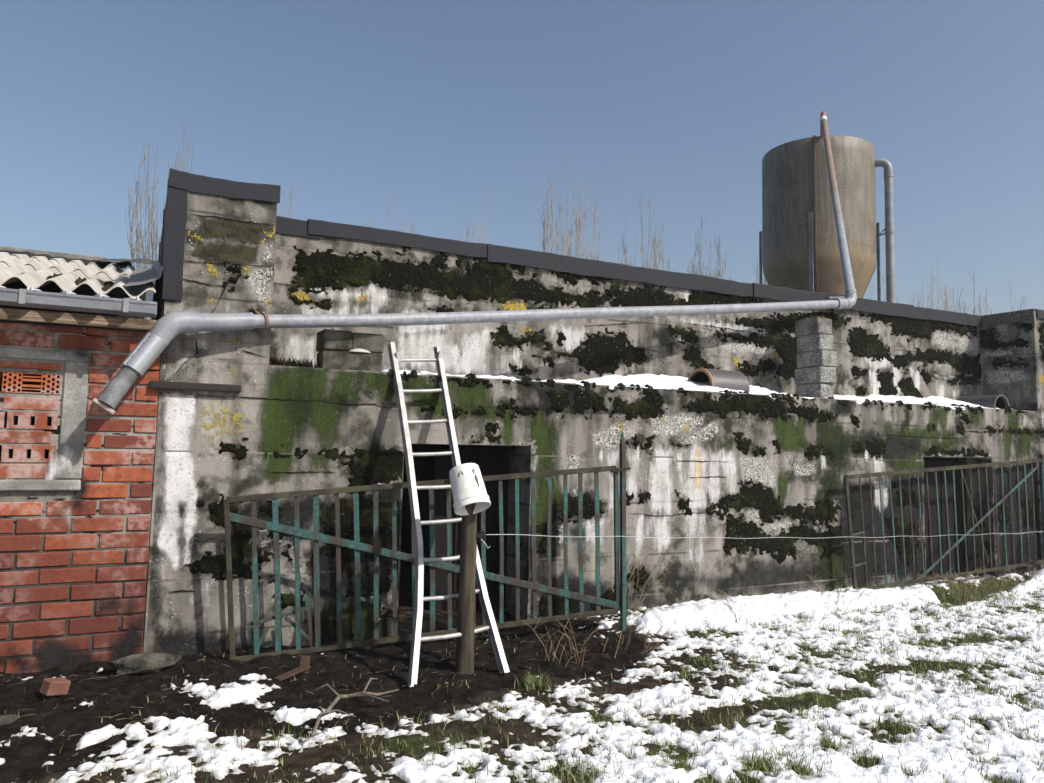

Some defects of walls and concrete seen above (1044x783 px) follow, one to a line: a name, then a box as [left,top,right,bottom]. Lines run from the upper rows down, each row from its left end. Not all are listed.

leakage [302,284,387,314]
leakage [152,392,198,570]
leakage [538,444,828,594]
leakage [537,572,611,617]
leakage [633,581,668,608]